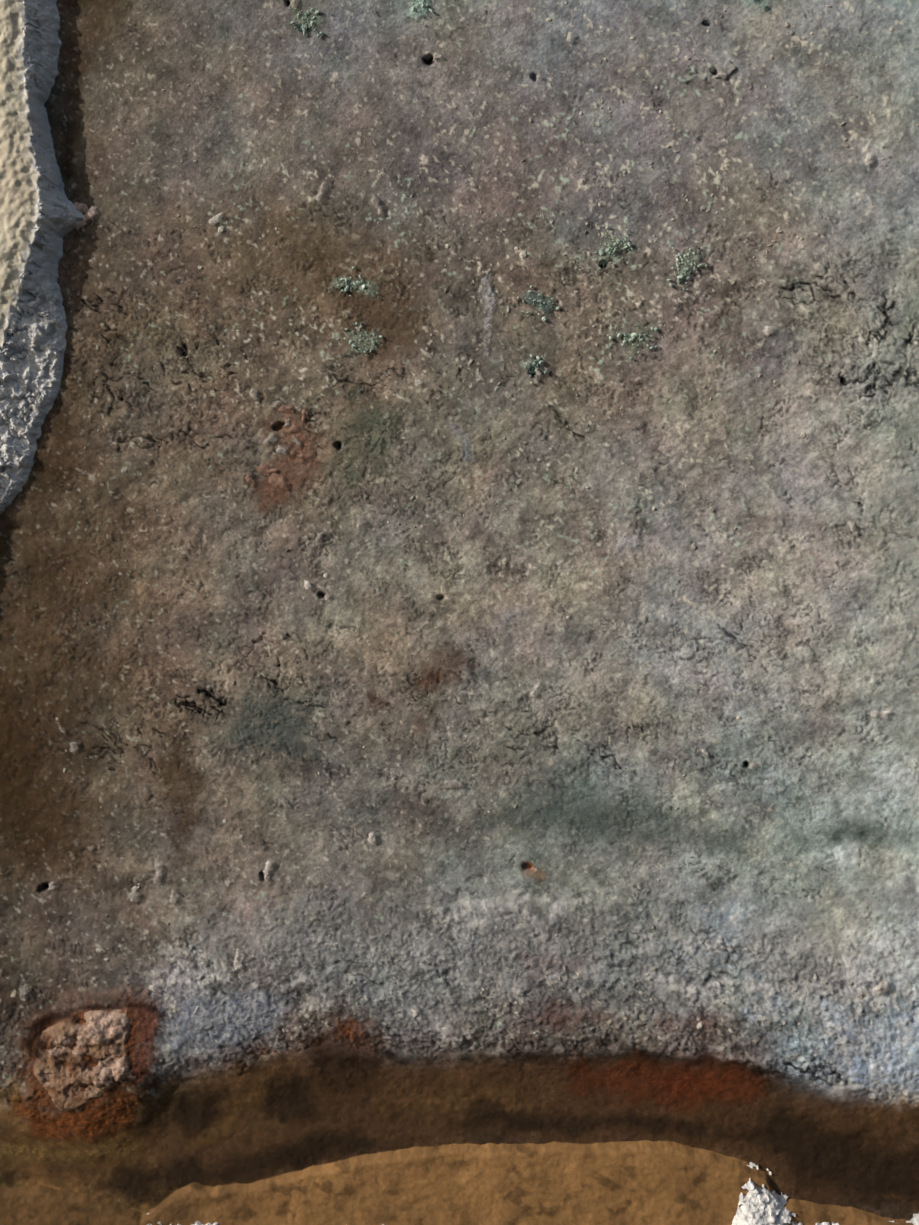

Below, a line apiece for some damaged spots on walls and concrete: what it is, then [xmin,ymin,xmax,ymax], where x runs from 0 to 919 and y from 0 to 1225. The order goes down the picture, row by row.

spalling [0,0,98,513]
crack [781,273,919,400]
peeling [48,1015,119,1056]
rust [15,987,160,1140]
peeling [94,1056,136,1088]
damp [0,1049,919,1206]
damp [844,1015,919,1091]
spalling [732,1162,840,1225]